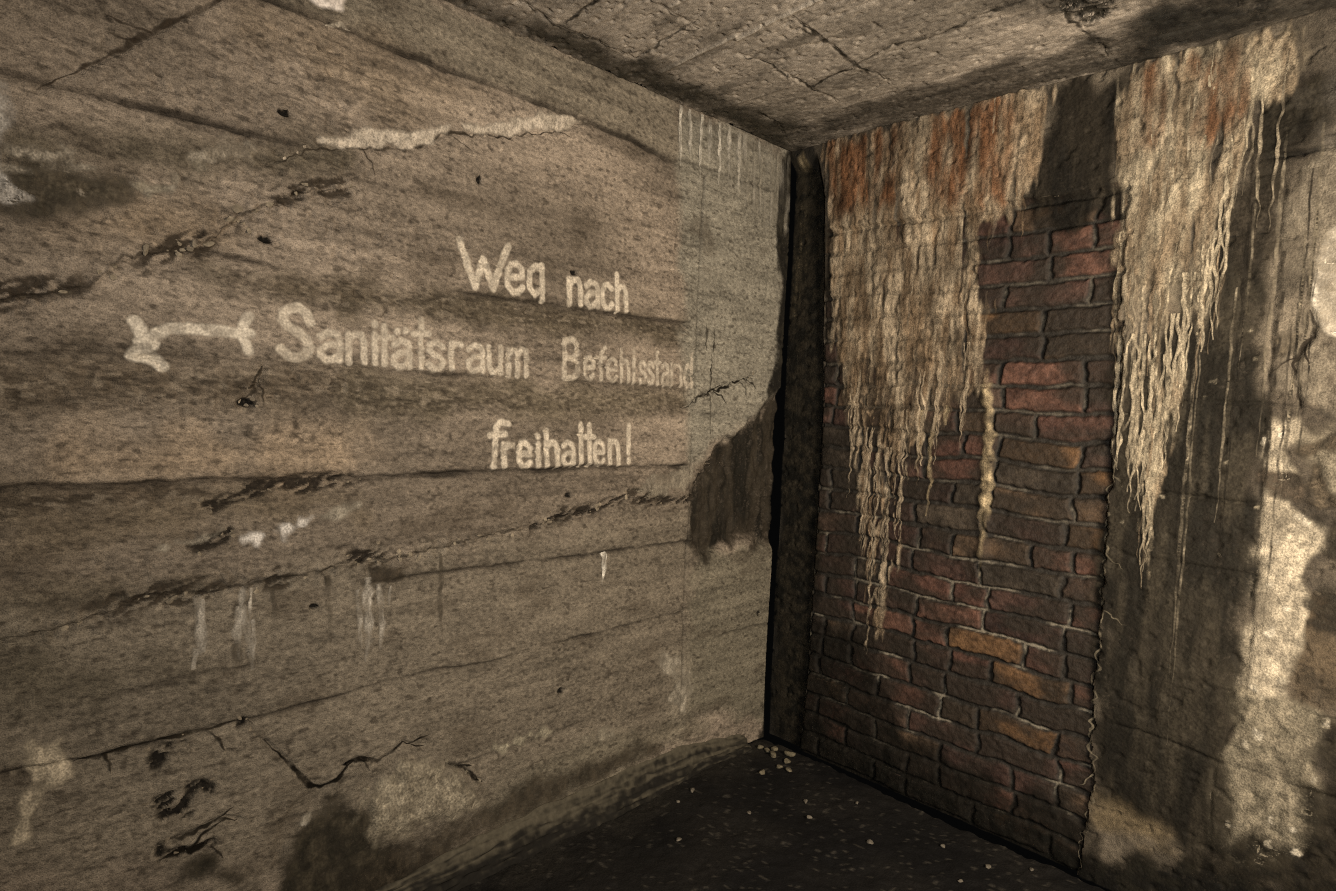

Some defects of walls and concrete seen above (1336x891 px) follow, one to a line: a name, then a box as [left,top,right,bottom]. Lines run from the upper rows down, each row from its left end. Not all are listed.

crack [39,0,221,89]
crack [522,0,699,58]
crack [746,1,1023,102]
crack [1060,2,1109,56]
crack [0,124,583,311]
rust [820,85,1057,645]
damp [493,0,1336,891]
crack [70,720,236,773]
crack [263,735,482,788]